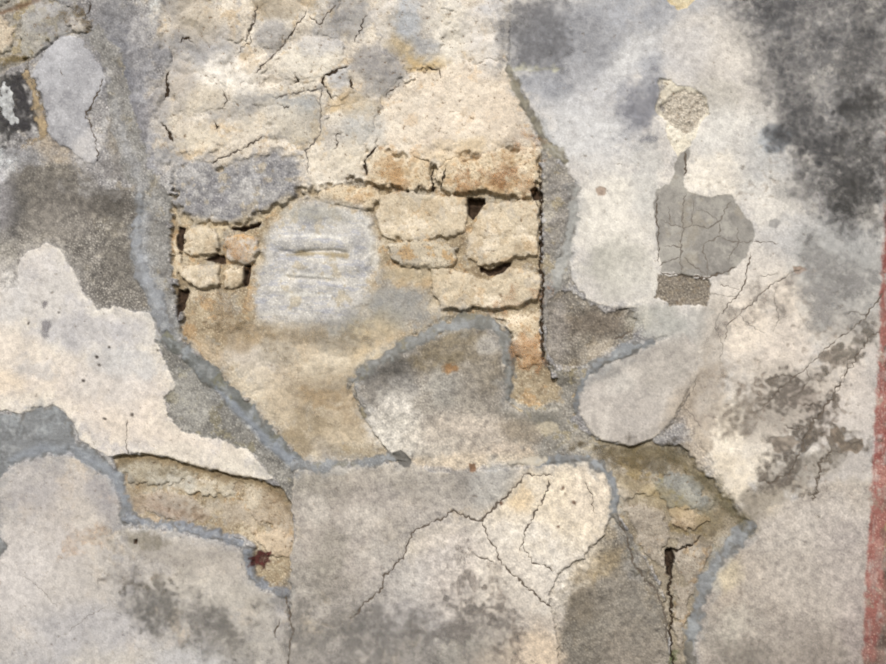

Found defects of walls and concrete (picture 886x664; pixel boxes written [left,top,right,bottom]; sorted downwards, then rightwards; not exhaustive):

spalling [0,0,93,141]
crack [273,66,354,172]
crack [363,146,378,175]
spalling [655,78,710,157]
water stain [746,0,886,214]
spalling [152,0,638,473]
crack [537,181,545,360]
peeling [655,275,712,307]
crack [655,152,801,356]
spalling [118,340,294,590]
crack [356,473,552,615]
crack [618,516,700,664]